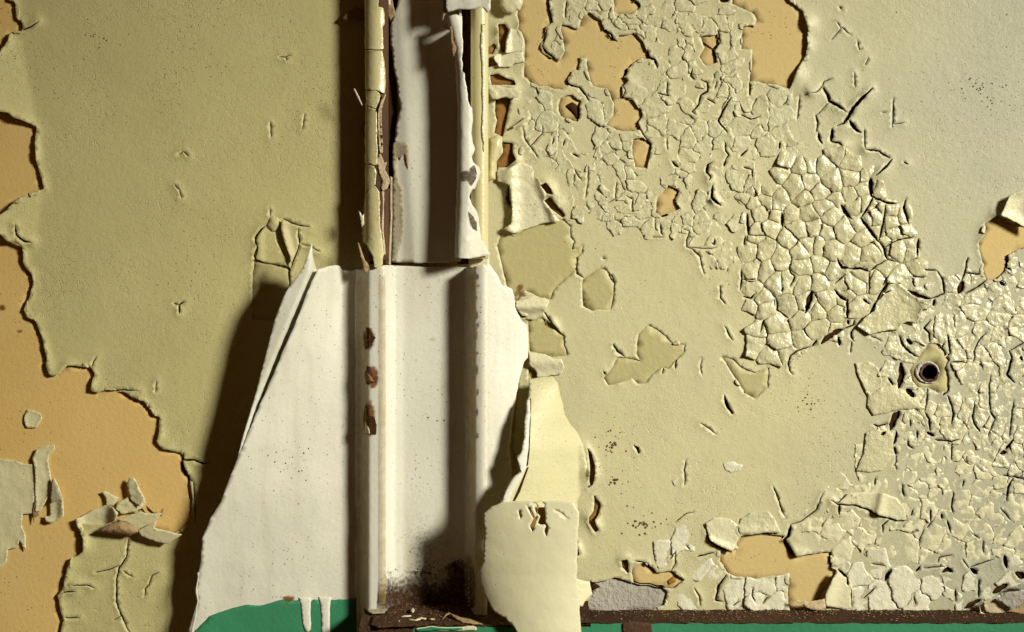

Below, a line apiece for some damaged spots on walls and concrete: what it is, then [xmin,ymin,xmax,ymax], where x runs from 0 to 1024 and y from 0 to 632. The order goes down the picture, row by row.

spalling [462,9,471,106]
spalling [389,0,397,221]
peeling [0,112,44,214]
crack [254,218,320,267]
crack [574,169,633,209]
crack [654,7,1023,455]
peeling [488,0,1024,614]
peeling [0,235,192,632]
peeling [189,216,385,632]
crack [773,487,823,557]
crack [63,543,159,631]
corrosion [377,559,475,610]